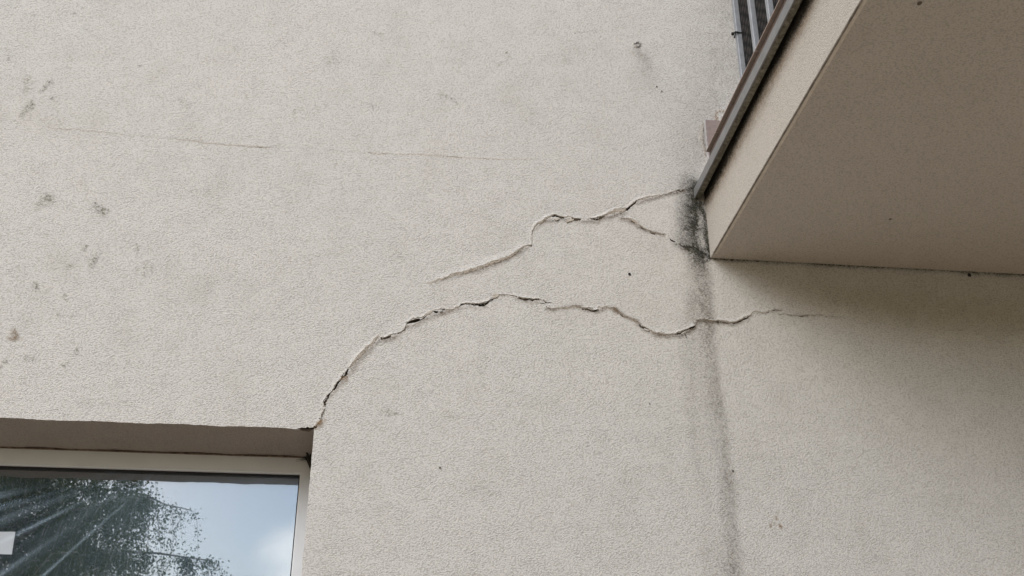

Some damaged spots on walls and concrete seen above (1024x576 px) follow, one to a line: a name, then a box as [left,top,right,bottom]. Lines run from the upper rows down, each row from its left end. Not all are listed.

crack [297,186,833,432]
damp [676,181,713,332]